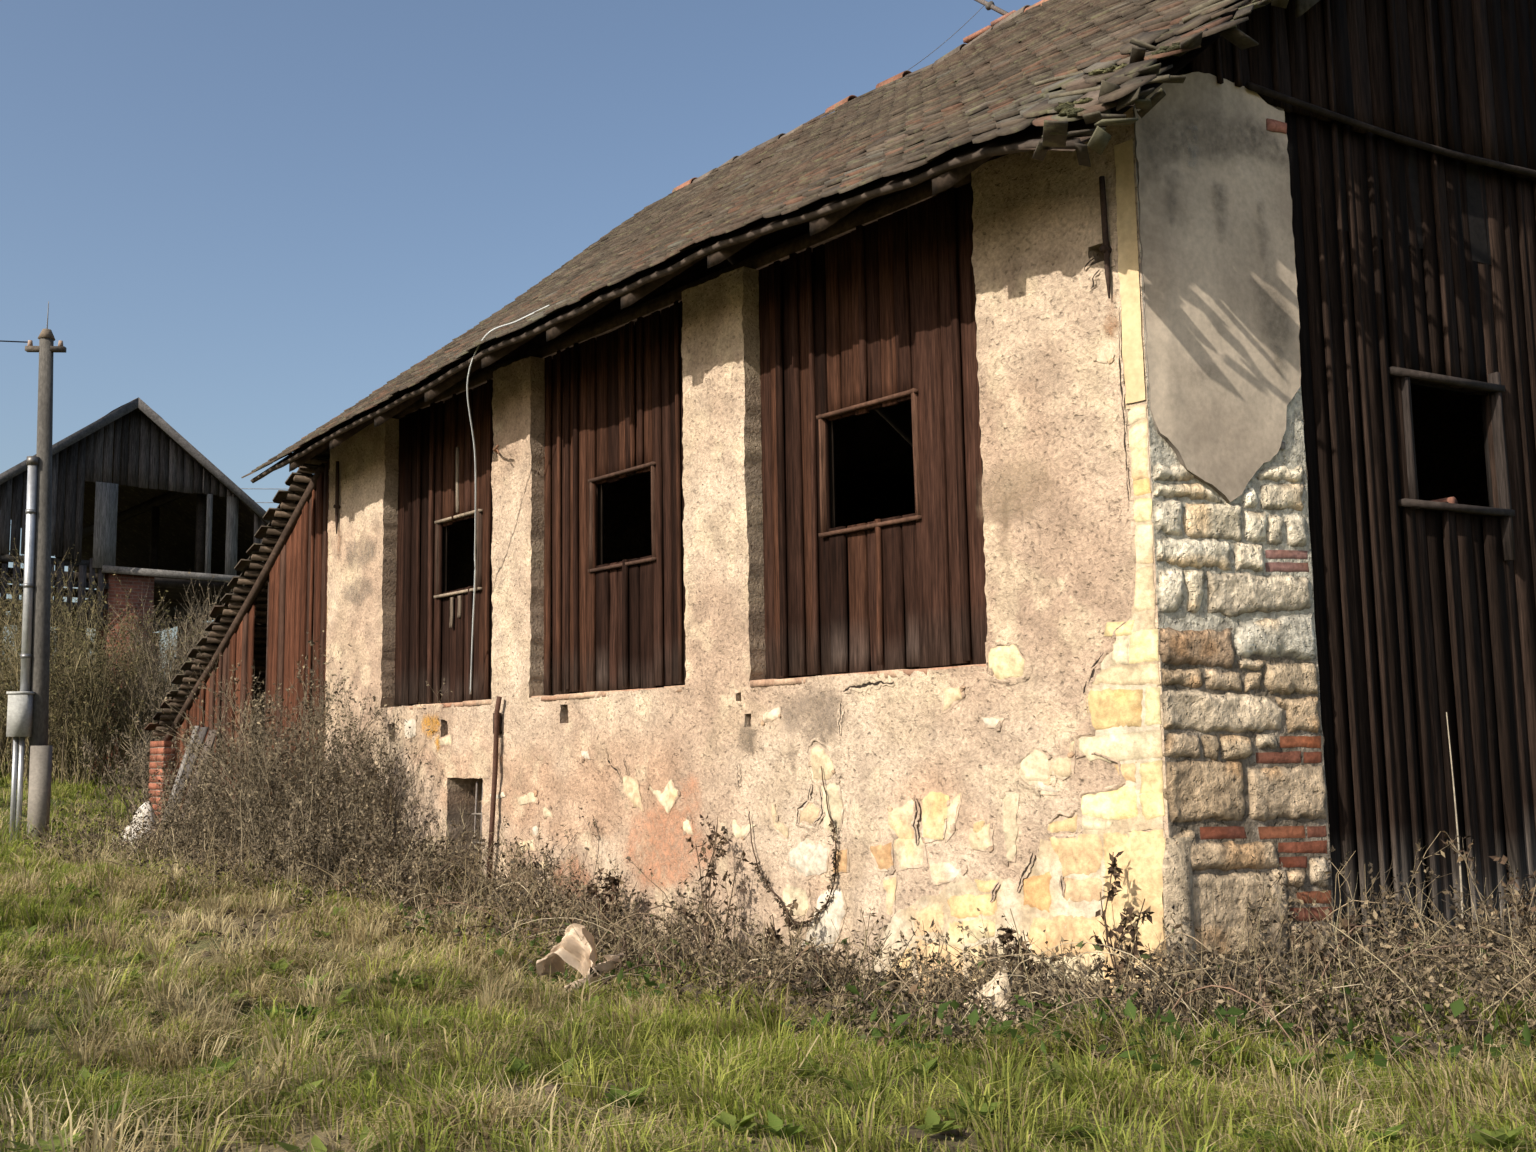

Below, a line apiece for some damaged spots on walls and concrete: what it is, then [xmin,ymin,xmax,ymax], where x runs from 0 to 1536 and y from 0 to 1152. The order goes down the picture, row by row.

spalling [869,0,1336,1021]
spalling [623,775,695,837]
spalling [760,705,781,726]
spalling [731,738,849,959]